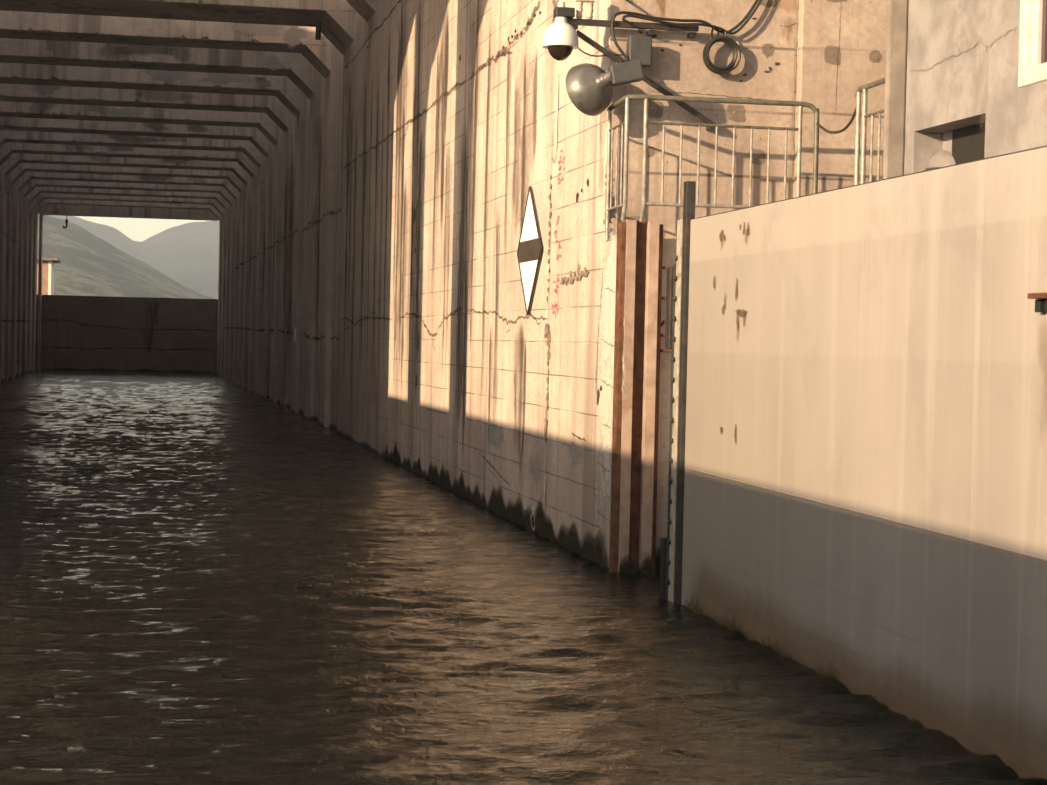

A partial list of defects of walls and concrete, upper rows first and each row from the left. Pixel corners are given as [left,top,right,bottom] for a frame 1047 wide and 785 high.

crack [322,0,401,100]
crack [911,28,1016,71]
crack [2,275,549,353]
crack [235,66,484,268]
damp [346,30,421,341]
damp [433,21,448,241]
damp [457,23,497,412]
damp [505,59,537,228]
crack [549,231,589,285]
rust [713,276,746,337]
crack [480,451,510,485]